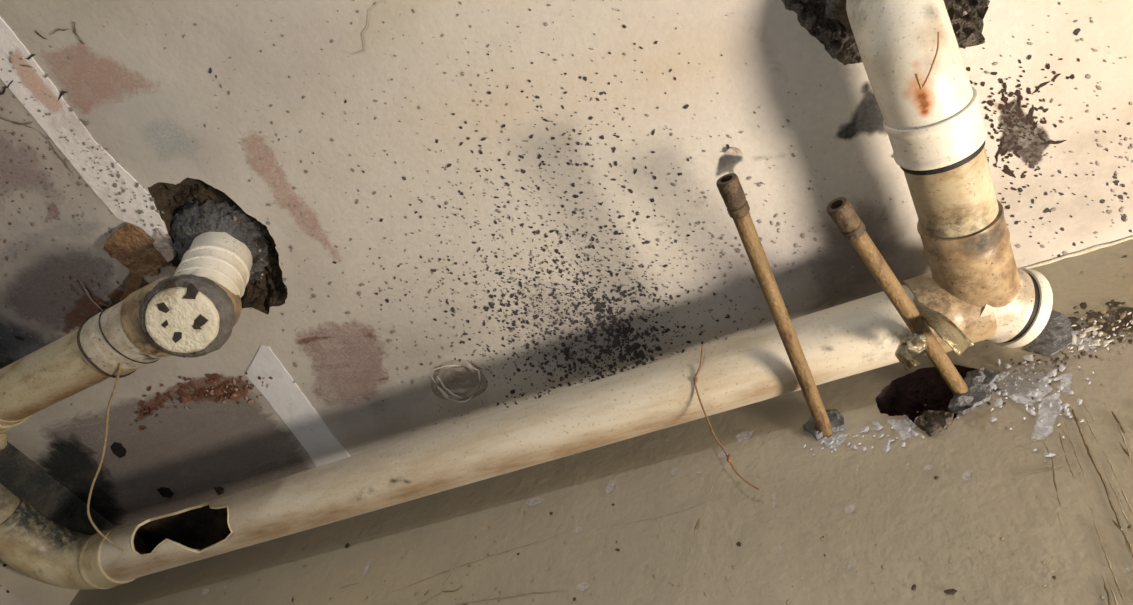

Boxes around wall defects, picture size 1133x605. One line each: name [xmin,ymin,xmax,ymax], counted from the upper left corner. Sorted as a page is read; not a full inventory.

spalling [782,0,862,65]
spalling [944,0,990,48]
damp [838,84,885,139]
mould [967,54,1133,258]
spalling [80,177,288,315]
damp [346,41,765,408]
damp [749,170,872,302]
damp [0,317,52,369]
rust [130,372,273,431]
spalling [802,367,959,456]
spalling [953,364,977,380]
peeling [976,299,1133,438]